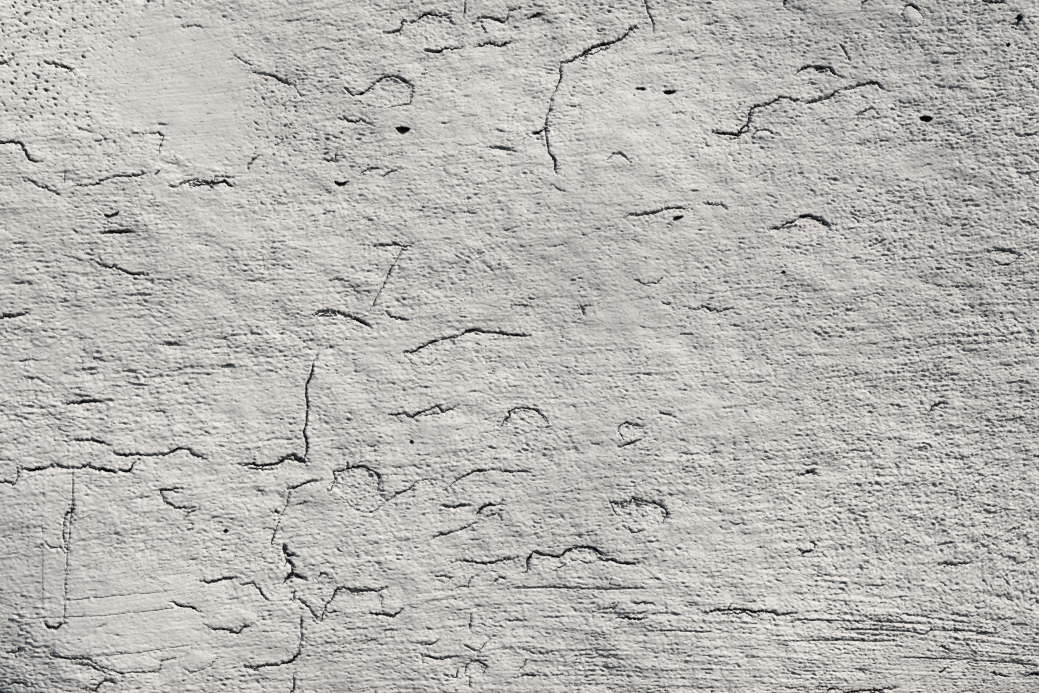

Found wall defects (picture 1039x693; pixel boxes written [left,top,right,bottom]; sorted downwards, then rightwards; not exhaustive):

crack [533,0,654,172]
crack [715,44,883,140]
crack [313,243,412,327]
crack [62,398,109,406]
crack [0,438,205,485]
crack [39,505,74,549]
crack [160,488,199,521]
crack [200,356,323,693]
crack [170,601,201,612]